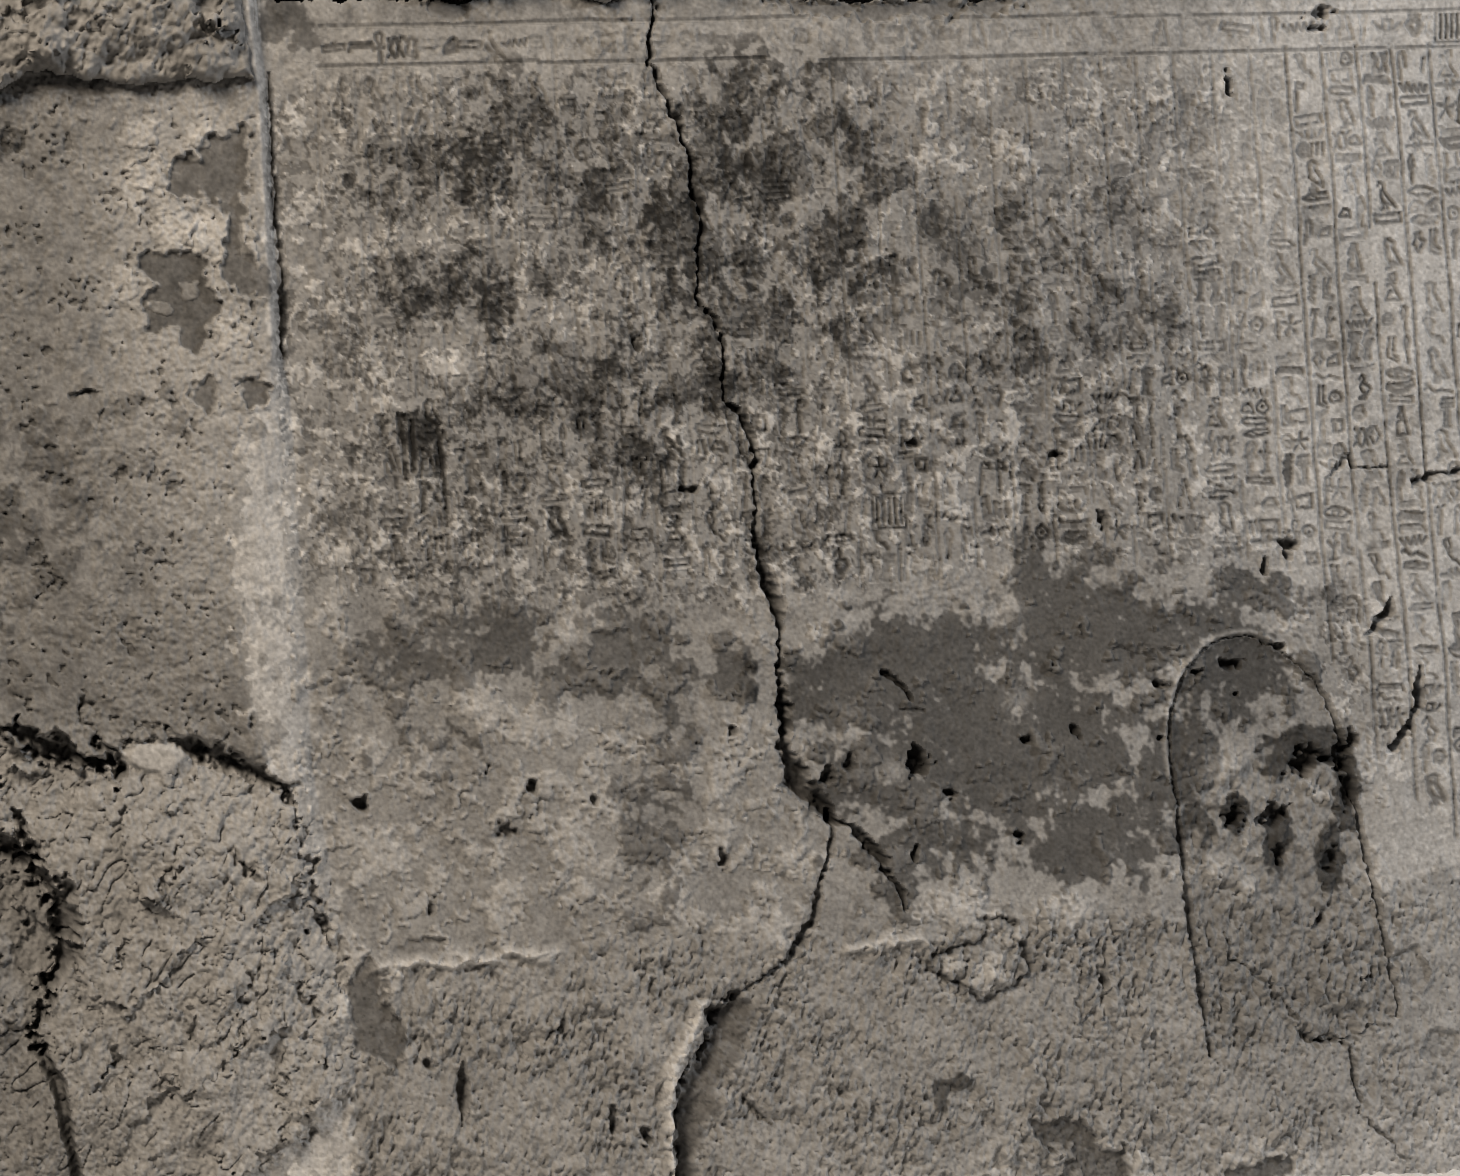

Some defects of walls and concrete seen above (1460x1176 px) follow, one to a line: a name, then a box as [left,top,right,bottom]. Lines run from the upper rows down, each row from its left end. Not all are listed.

crack [0,688,130,1176]
crack [166,728,338,958]
crack [641,0,910,1176]
damp [310,491,1375,938]